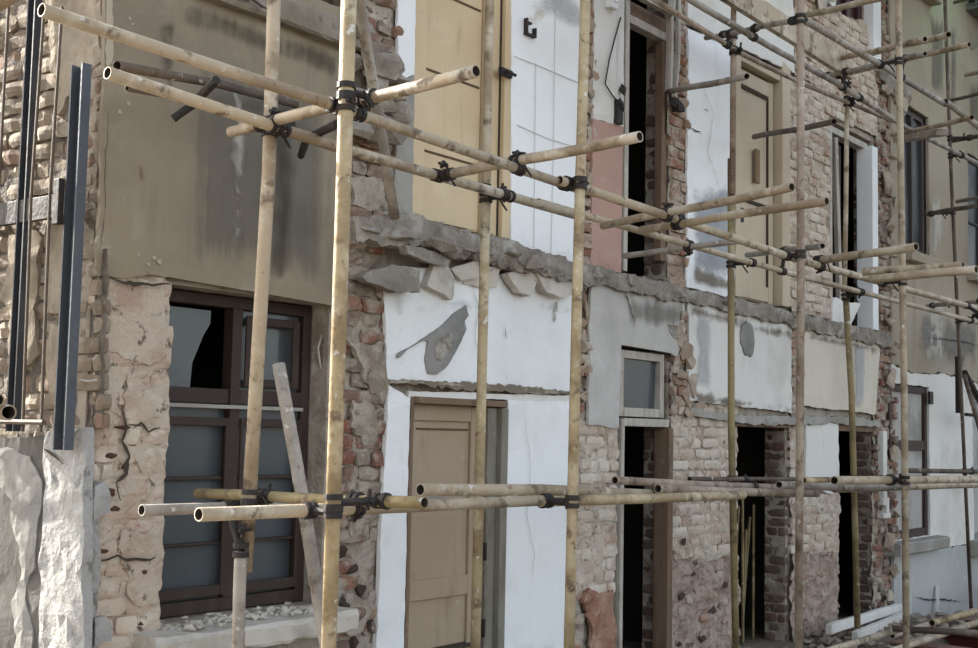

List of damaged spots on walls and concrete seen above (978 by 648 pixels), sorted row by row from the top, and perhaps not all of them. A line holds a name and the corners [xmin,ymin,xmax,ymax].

crack [245,0,267,9]
spalling [354,0,409,91]
spalling [790,0,912,319]
spalling [88,253,174,648]
crack [116,412,160,501]
spalling [341,242,390,495]
spalling [578,281,620,488]
spalling [667,303,739,482]
spalling [336,514,379,648]
spalling [575,505,618,648]
spalling [672,499,741,648]
spalling [867,491,901,619]